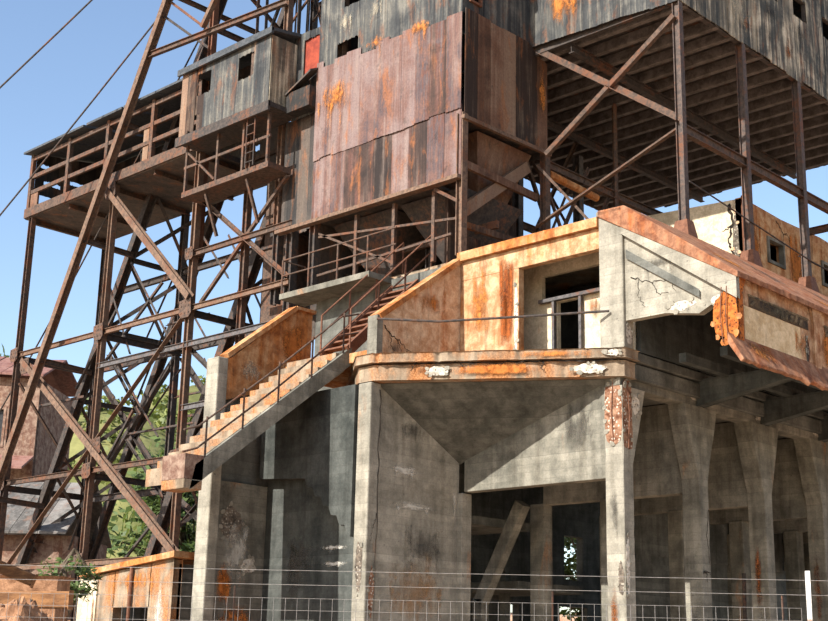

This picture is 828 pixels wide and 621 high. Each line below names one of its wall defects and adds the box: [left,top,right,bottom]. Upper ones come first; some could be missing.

corrosion [473,273,488,331]
corrosion [499,263,513,341]
spalling [601,323,635,356]
crack [630,277,675,306]
spalling [710,286,742,346]
spalling [425,366,449,377]
spalling [569,361,607,375]
spalling [602,378,642,449]
crack [369,390,382,590]
peeling [238,554,256,576]
corrosion [218,567,247,621]